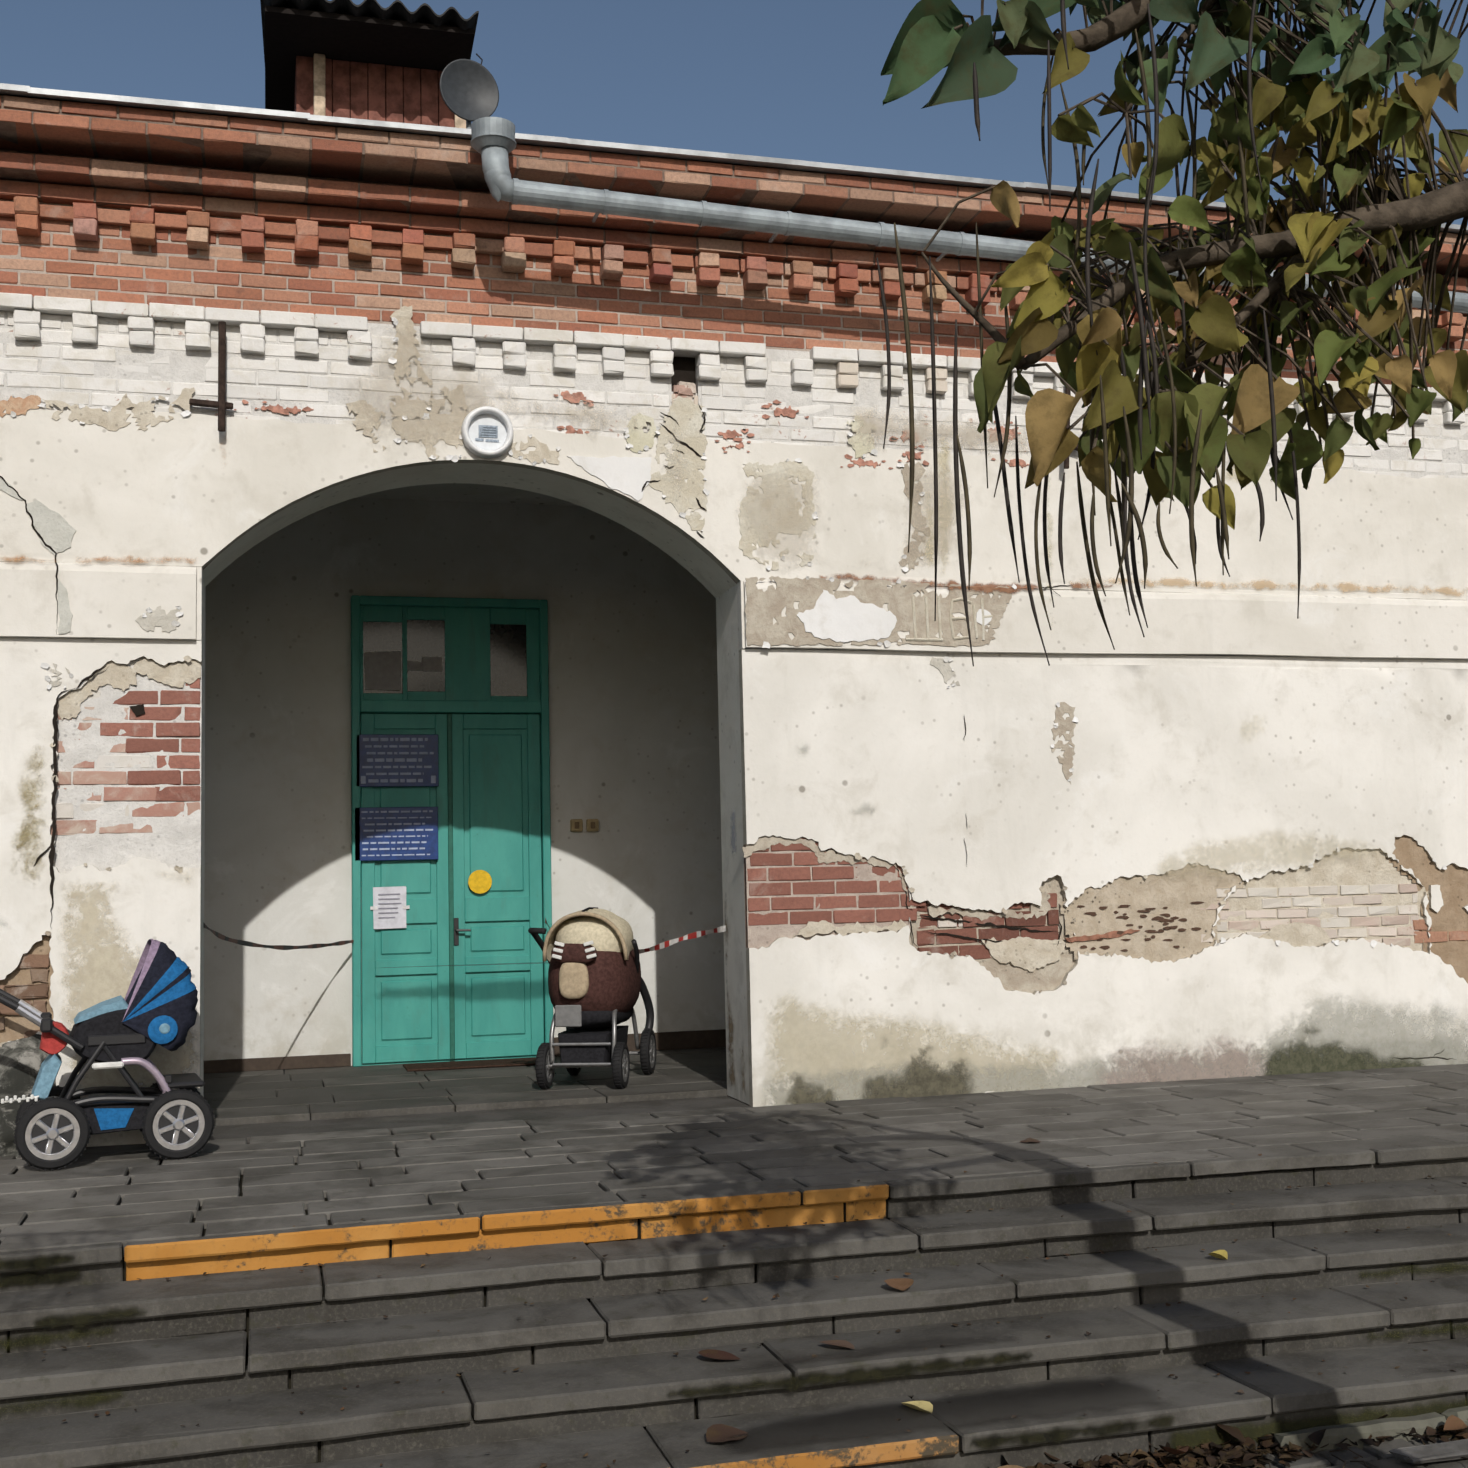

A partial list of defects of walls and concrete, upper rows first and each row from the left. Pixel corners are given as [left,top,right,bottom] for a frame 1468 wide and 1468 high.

flaking render [0,387,195,431]
flaking render [346,306,469,462]
crack [0,476,58,634]
flaking render [623,357,1017,688]
crack [33,664,107,929]
flaking render [40,656,202,874]
flaking render [0,931,54,1047]
mould [787,1077,833,1104]
mould [863,1055,971,1099]
flaking render [742,835,1468,993]
leakage [1107,1010,1468,1084]